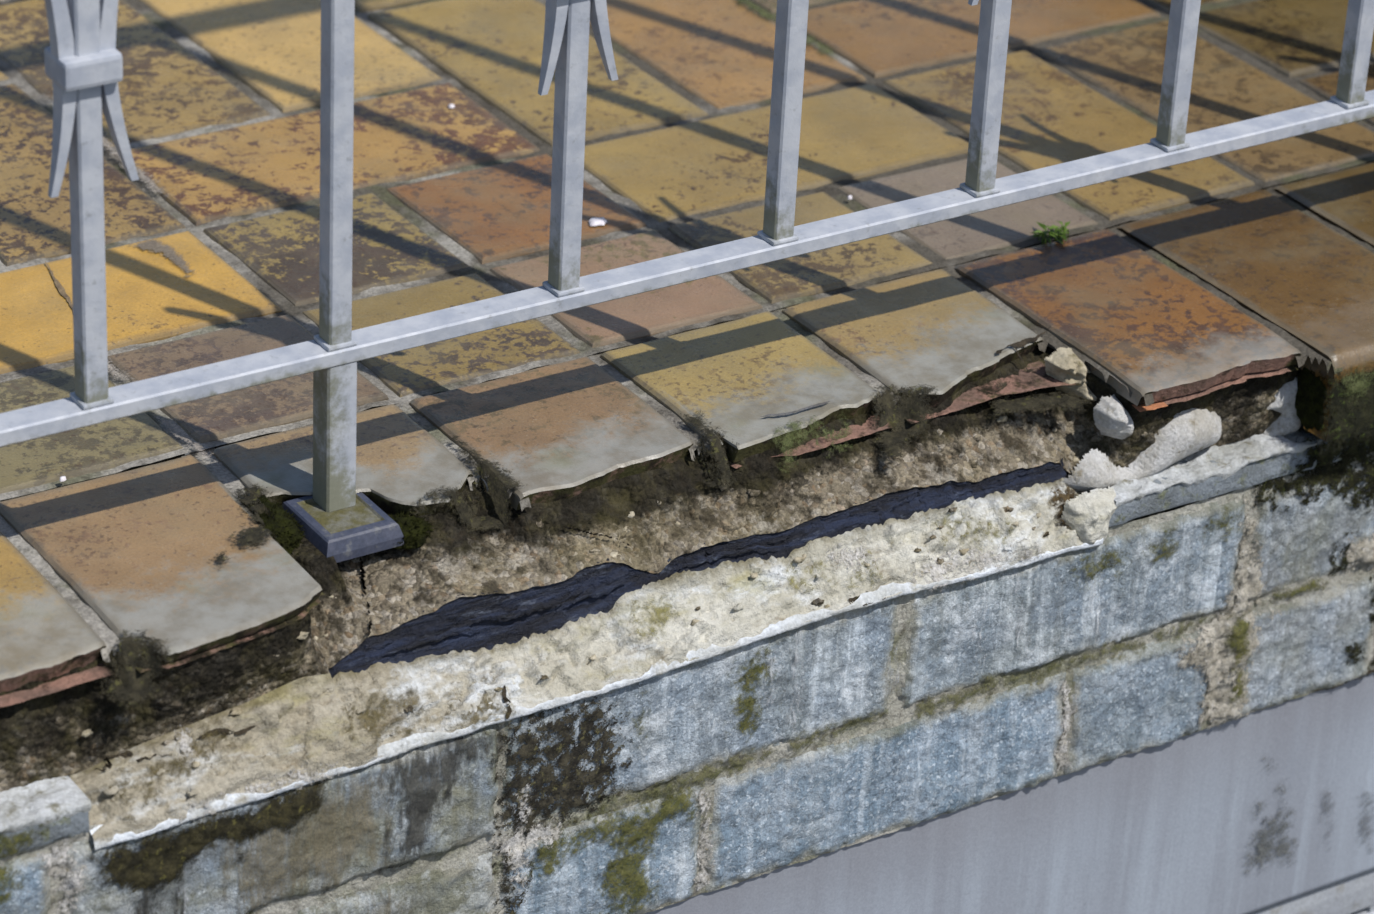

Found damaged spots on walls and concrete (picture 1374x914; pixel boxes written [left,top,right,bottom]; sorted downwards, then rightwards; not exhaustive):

crack [45,261,73,310]
spalling [0,346,1302,847]
damp [1341,529,1374,576]
damp [0,538,1103,914]
damp [1245,784,1298,873]